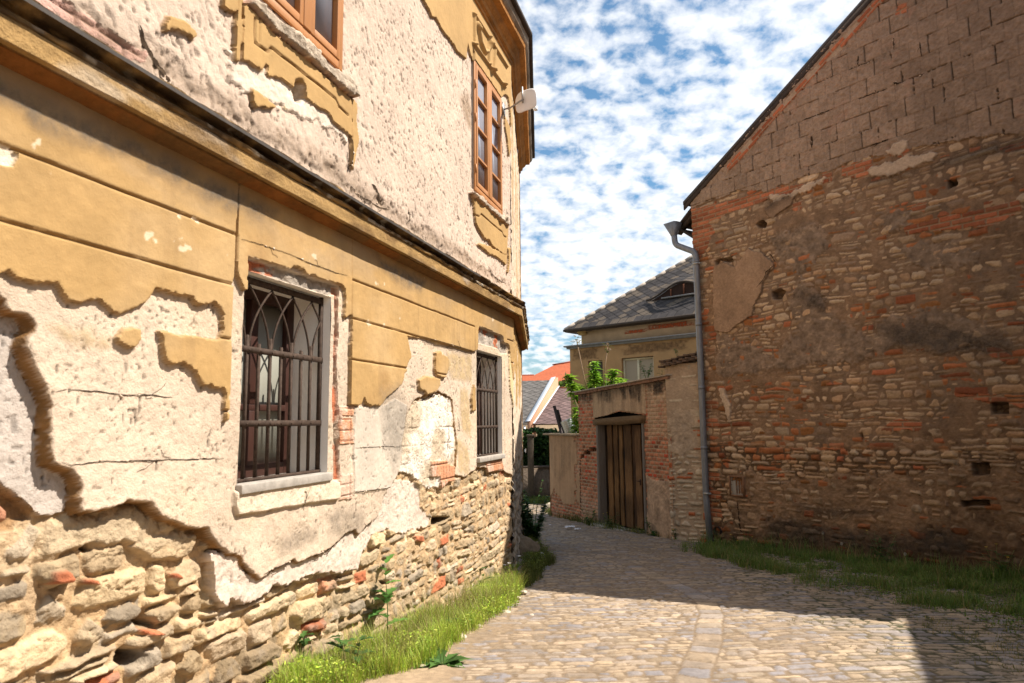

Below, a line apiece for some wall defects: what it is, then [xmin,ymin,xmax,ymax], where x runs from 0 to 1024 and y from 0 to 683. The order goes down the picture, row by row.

flaking render [36,0,148,63]
peeling [163,16,197,38]
peeling [225,0,353,135]
flaking render [691,184,805,252]
peeling [712,248,775,332]
crack [60,383,166,399]
crack [65,448,221,471]
flaking render [0,187,514,683]